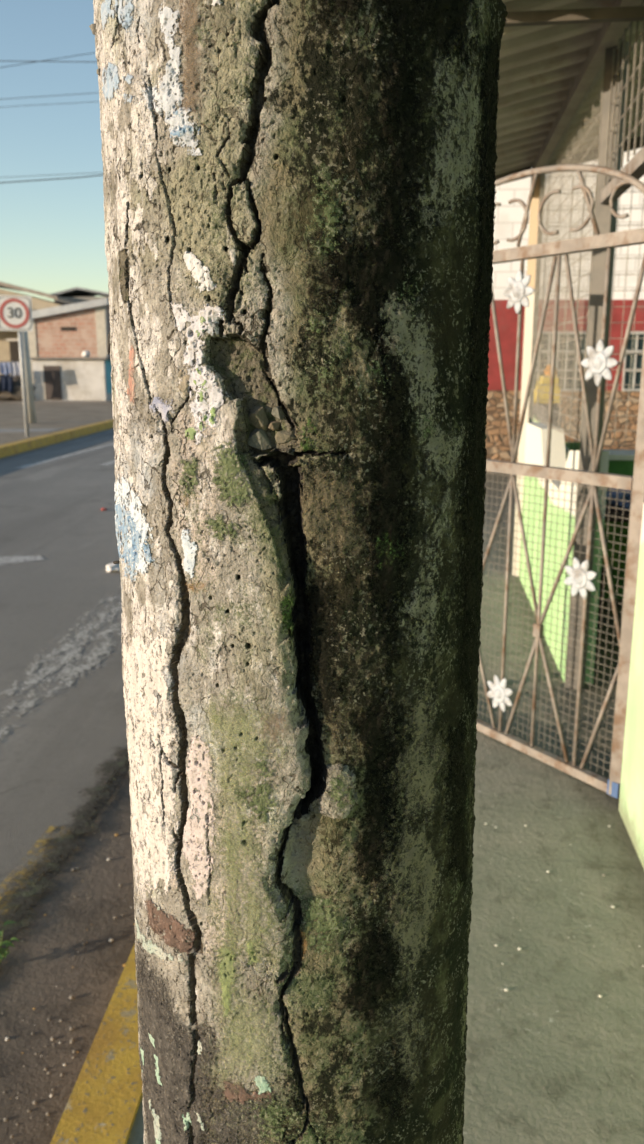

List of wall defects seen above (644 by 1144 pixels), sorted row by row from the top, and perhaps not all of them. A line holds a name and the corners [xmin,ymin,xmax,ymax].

peeling [89,0,133,35]
crack [124,202,135,330]
peeling [97,3,202,156]
crack [147,78,176,301]
spalling [148,251,300,580]
peeling [113,474,154,587]
crack [213,0,348,1144]
damp [299,0,504,1126]
crack [140,357,212,1144]